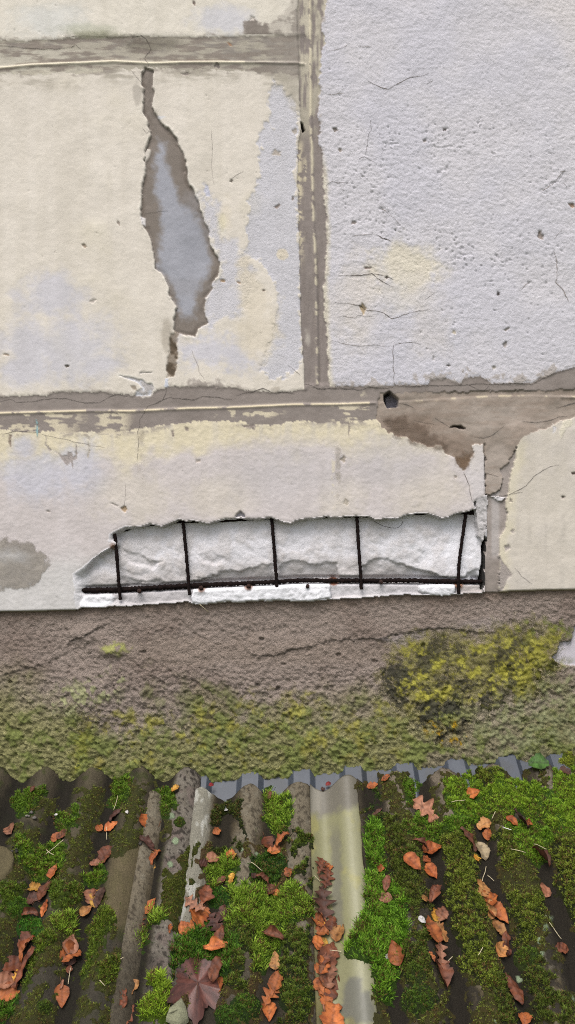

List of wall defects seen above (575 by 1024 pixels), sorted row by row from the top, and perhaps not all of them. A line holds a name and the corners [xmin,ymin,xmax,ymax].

peeling [141,69,303,388]
damp [0,538,50,591]
spalling [73,496,506,610]